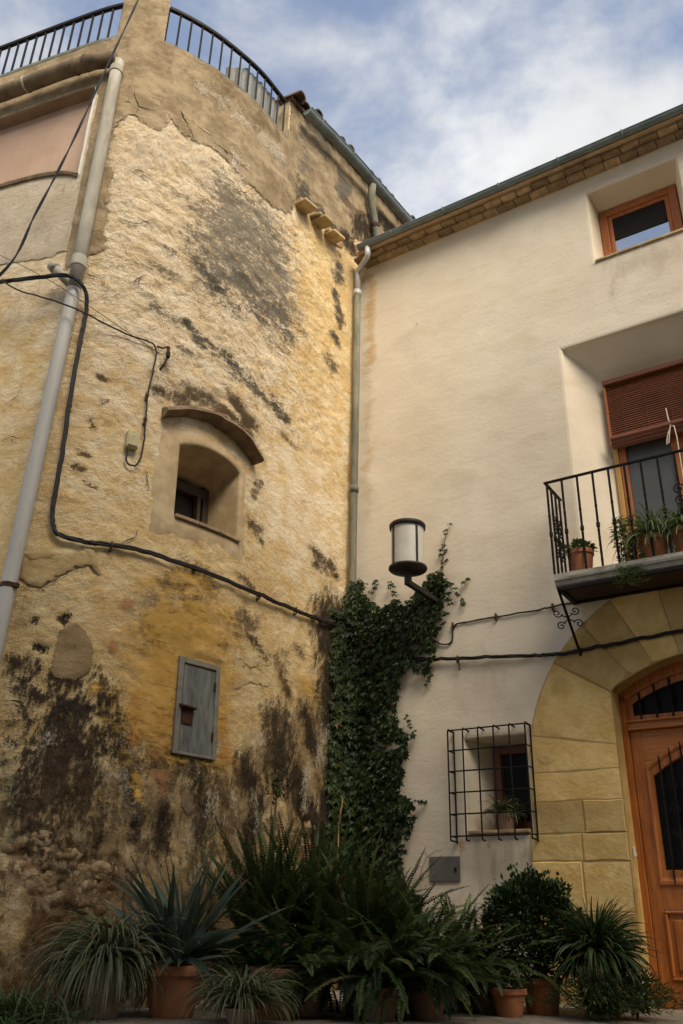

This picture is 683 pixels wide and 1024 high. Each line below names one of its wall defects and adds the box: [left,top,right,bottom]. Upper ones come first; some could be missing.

crack [125,90,253,197]
water stain [141,229,298,350]
water stain [144,301,300,448]
flaking render [19,548,102,587]
water stain [0,542,343,867]
flaking render [0,828,120,921]